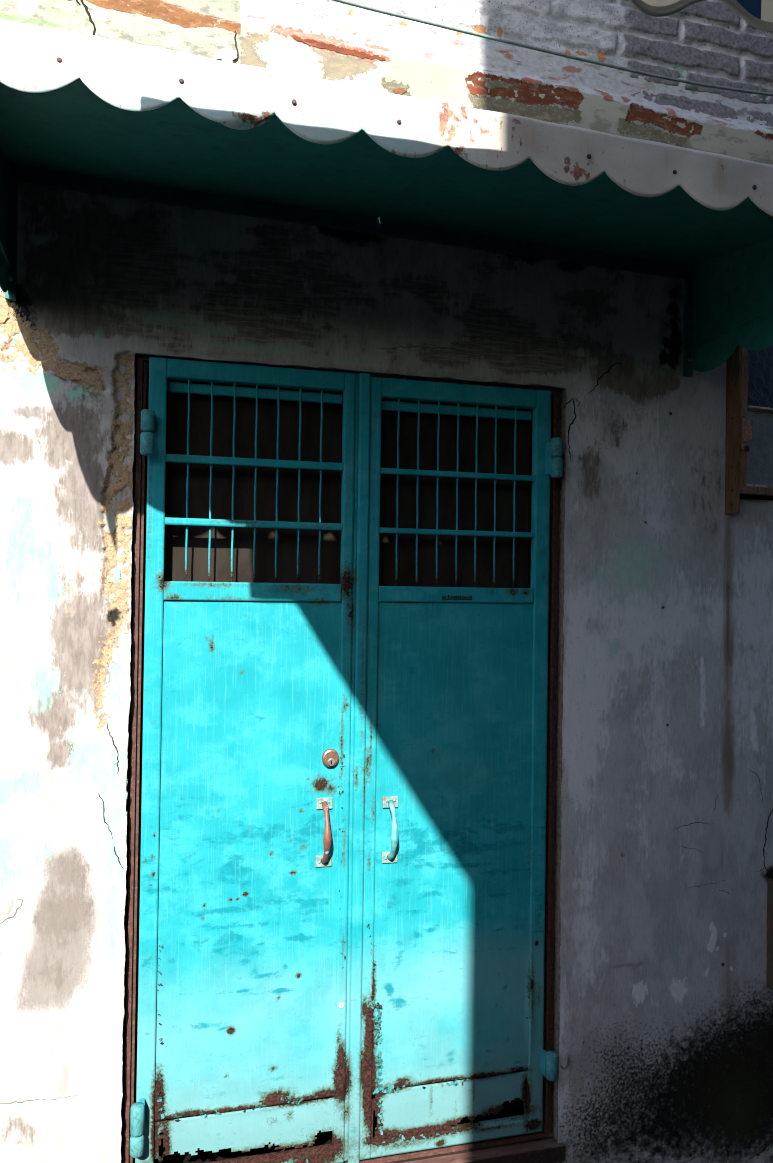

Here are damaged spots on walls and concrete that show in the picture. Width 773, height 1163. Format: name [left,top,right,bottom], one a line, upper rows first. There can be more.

crack [76,0,96,36]
crack [231,31,239,63]
flaking render [87,0,412,97]
flaking render [465,71,703,148]
flaking render [0,290,135,731]
crack [98,723,124,869]
crack [749,770,773,879]
water stain [20,852,91,1008]
water stain [560,986,773,1163]